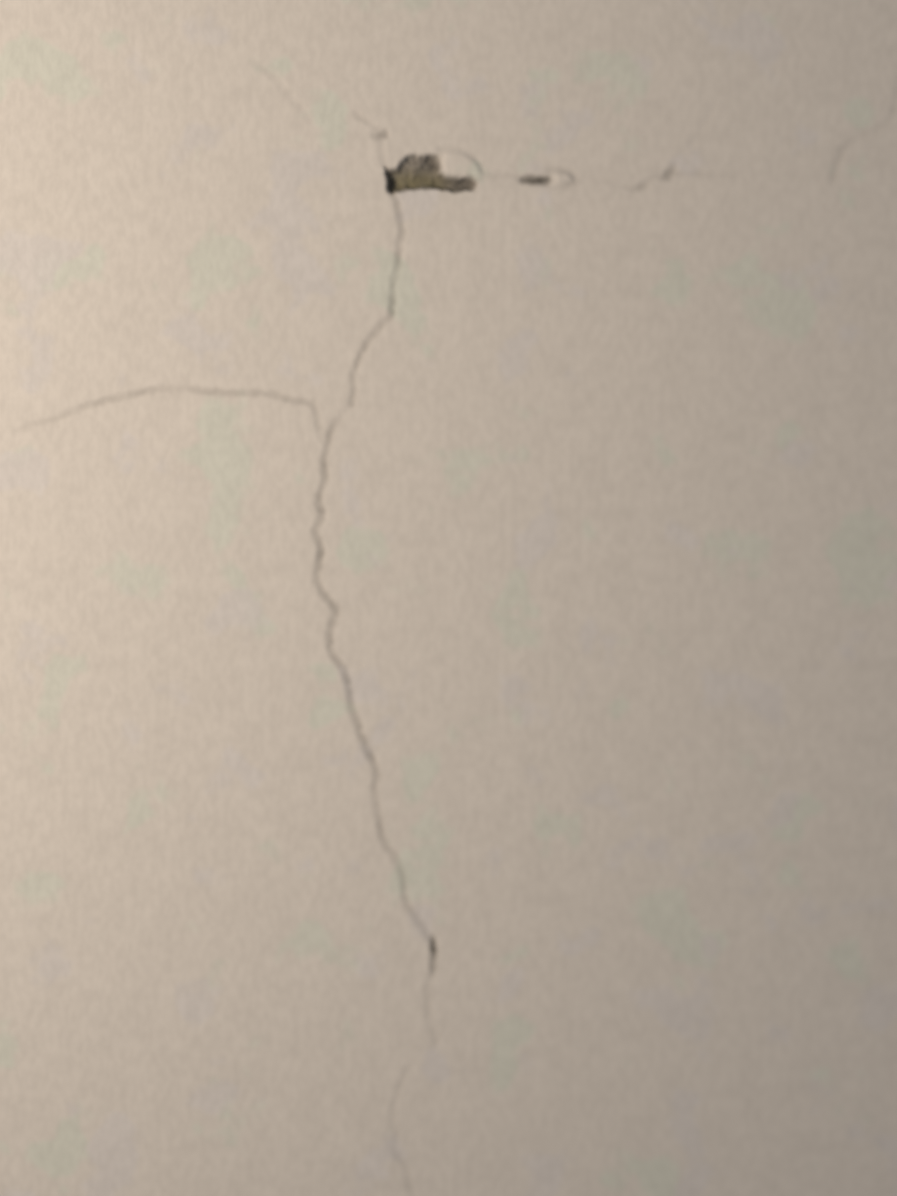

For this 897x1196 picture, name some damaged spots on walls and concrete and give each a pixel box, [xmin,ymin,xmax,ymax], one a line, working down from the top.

flaking render [381,140,491,199]
crack [482,99,746,196]
crack [11,107,443,1196]